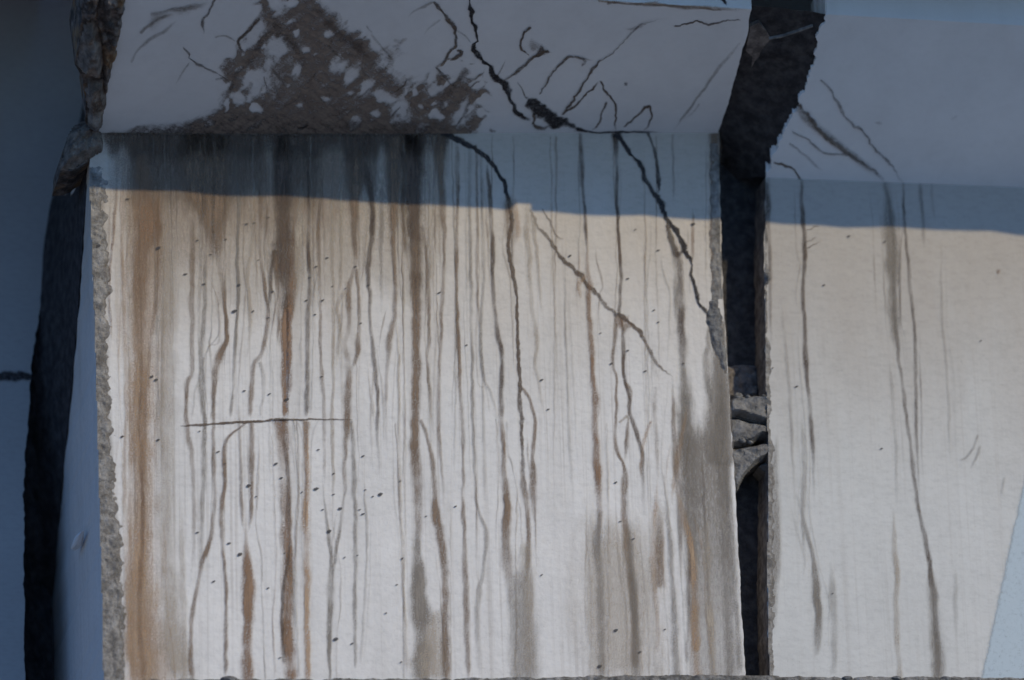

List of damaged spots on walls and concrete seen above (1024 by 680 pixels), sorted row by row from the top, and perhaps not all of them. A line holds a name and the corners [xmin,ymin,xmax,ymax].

spalling [52,0,127,680]
corrosion [125,161,187,678]
crack [185,418,343,427]
leakage [103,0,492,680]
crack [441,130,537,569]
leakage [501,430,511,562]
crack [434,0,708,343]
leakage [581,281,602,494]
crack [542,215,662,369]
leakage [612,172,644,509]
spalling [706,143,729,375]
spalling [764,180,776,676]